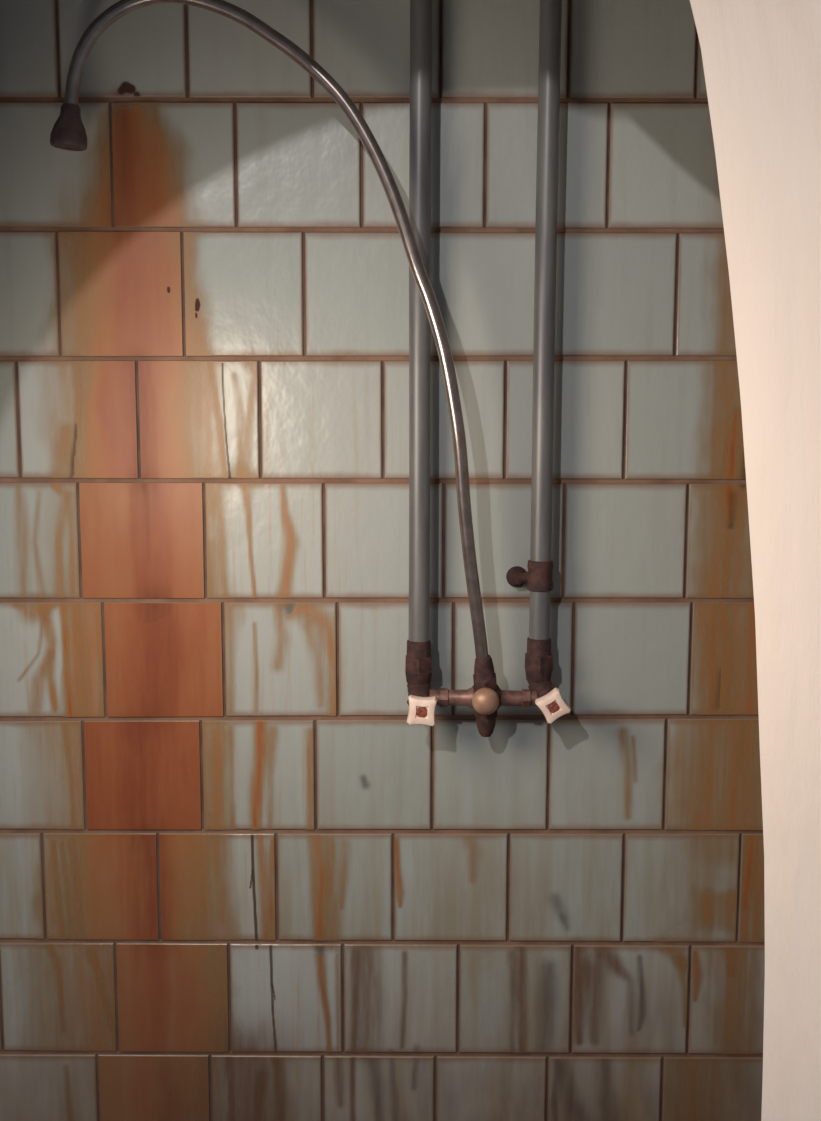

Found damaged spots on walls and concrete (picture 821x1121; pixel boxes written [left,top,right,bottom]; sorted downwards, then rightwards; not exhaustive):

rust [19,105,256,1121]
rust [278,487,336,716]
rust [693,361,764,1054]
rust [251,721,275,940]
rust [307,730,338,1053]
rust [395,838,403,907]
rust [351,950,369,1121]